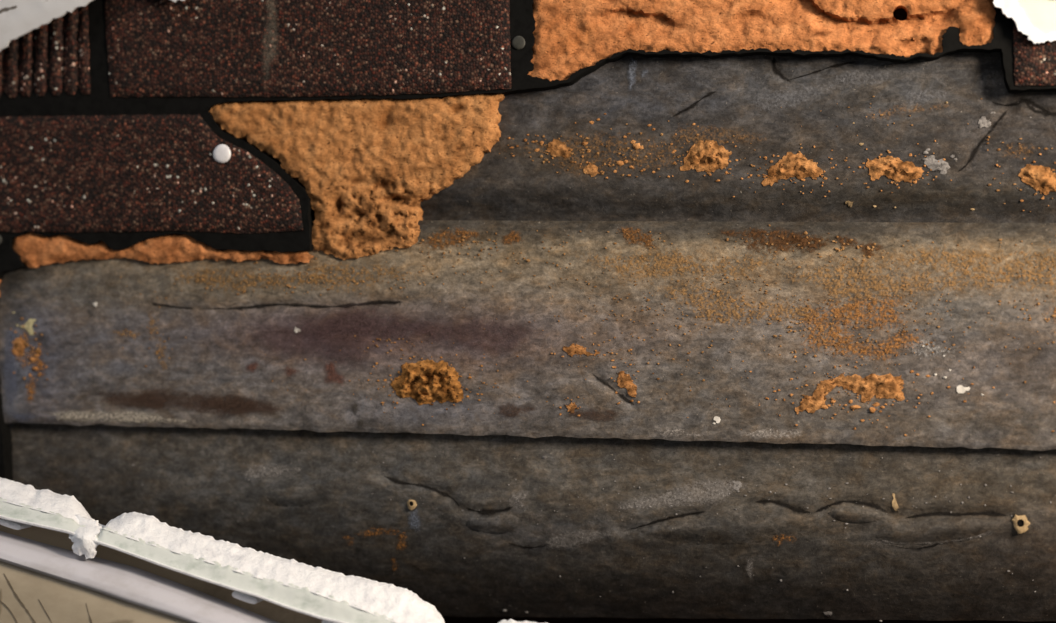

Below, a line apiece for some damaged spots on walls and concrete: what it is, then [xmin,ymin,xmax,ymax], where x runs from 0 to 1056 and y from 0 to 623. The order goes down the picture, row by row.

peeling [978,111,995,128]
crack [959,99,1056,171]
peeling [909,148,957,184]
crack [152,300,400,310]
peeling [12,312,36,335]
leakage [63,390,279,422]
peeling [849,400,885,413]
crack [385,476,512,515]
crack [757,499,1007,518]
crack [626,511,703,531]